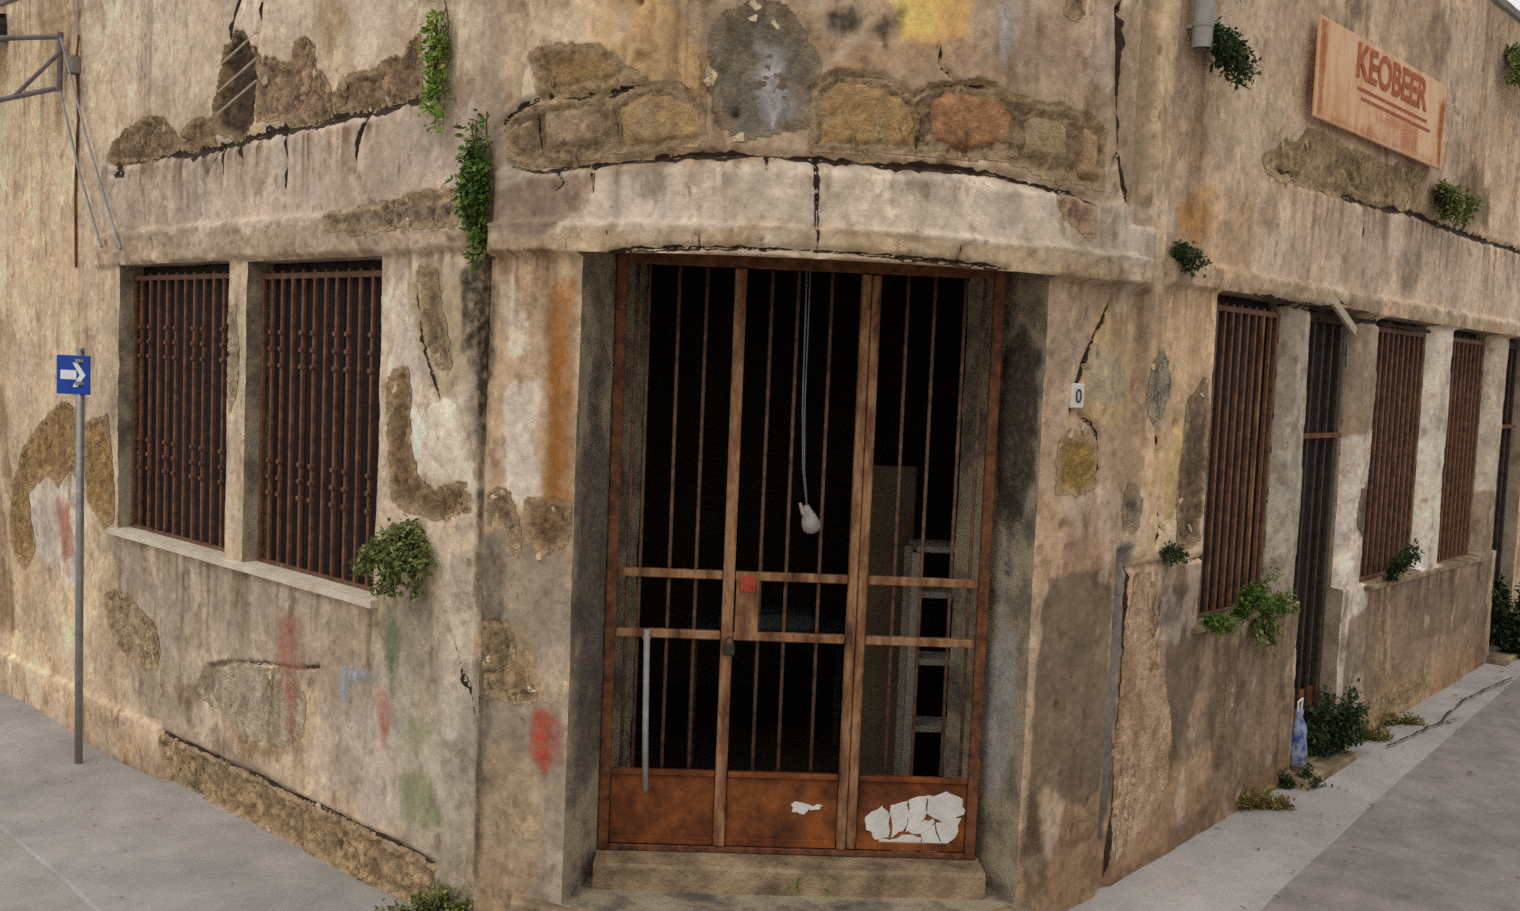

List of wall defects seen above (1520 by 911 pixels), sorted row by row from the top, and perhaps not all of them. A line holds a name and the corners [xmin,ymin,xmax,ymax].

spalling [106,30,426,166]
flaking render [504,0,1107,240]
crack [504,0,1127,271]
damp [828,7,860,31]
crack [1277,169,1520,255]
spalling [9,400,115,570]
spalling [385,367,572,561]
damp [997,329,1041,541]
crack [1069,298,1110,482]
crack [1253,293,1431,334]
flaking render [194,657,306,749]
spalling [159,733,437,906]